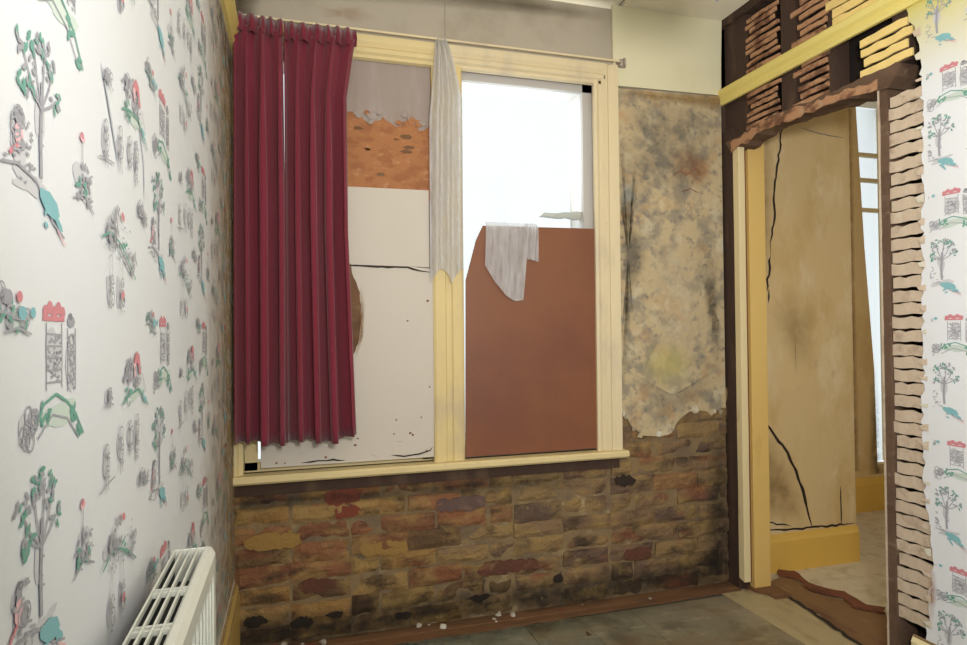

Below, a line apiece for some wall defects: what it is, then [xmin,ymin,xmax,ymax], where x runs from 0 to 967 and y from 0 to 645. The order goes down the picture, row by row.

damp [651,95,720,105]
peeling [347,110,430,202]
crack [766,128,843,303]
spalling [614,474,636,487]
crack [768,425,854,531]
spalling [324,488,362,519]
spalling [435,495,485,513]
spalling [360,539,408,557]
spalling [477,558,539,577]
spalling [300,578,336,594]
spalling [290,616,313,628]